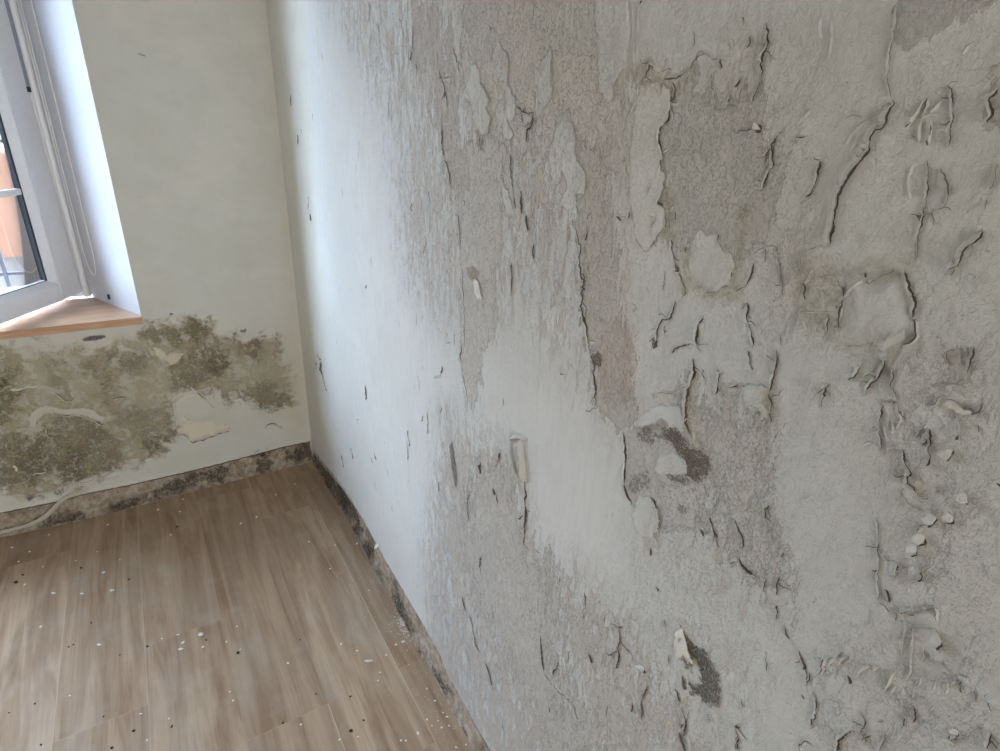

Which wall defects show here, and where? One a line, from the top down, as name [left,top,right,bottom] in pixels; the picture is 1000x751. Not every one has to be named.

peeling [983,62,1000,133]
crack [631,1,898,434]
crack [575,213,598,412]
peeling [400,0,801,629]
damp [0,313,293,496]
damp [638,428,711,484]
peeling [460,447,611,751]
peeling [674,626,697,669]
damp [688,646,721,707]
crack [865,517,940,621]
peeling [887,511,955,582]
peeling [834,726,874,751]